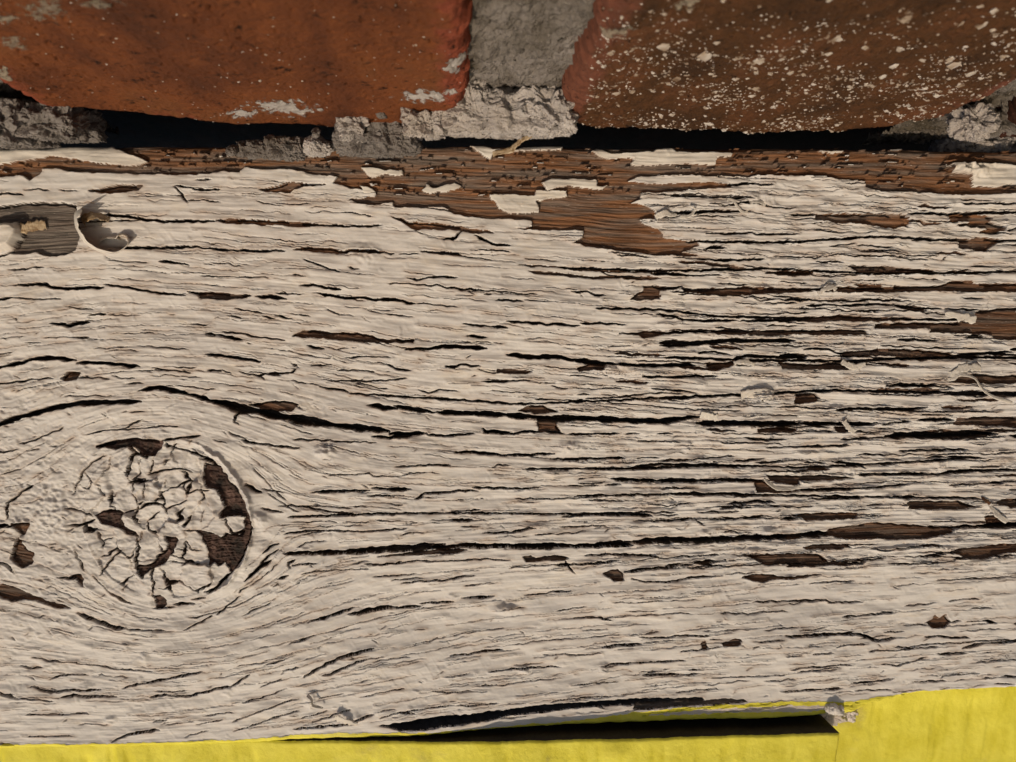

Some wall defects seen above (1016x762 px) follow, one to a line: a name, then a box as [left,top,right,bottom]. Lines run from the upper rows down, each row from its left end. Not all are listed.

peeling [0,146,1016,256]
peeling [848,265,933,274]
peeling [631,270,1016,300]
peeling [710,307,1016,341]
peeling [778,348,952,370]
peeling [949,373,1016,384]
peeling [952,416,1016,428]
crack [0,175,1016,740]
peeling [753,474,852,493]
peeling [908,498,1016,522]
peeling [742,512,953,583]
peeling [951,543,1016,560]